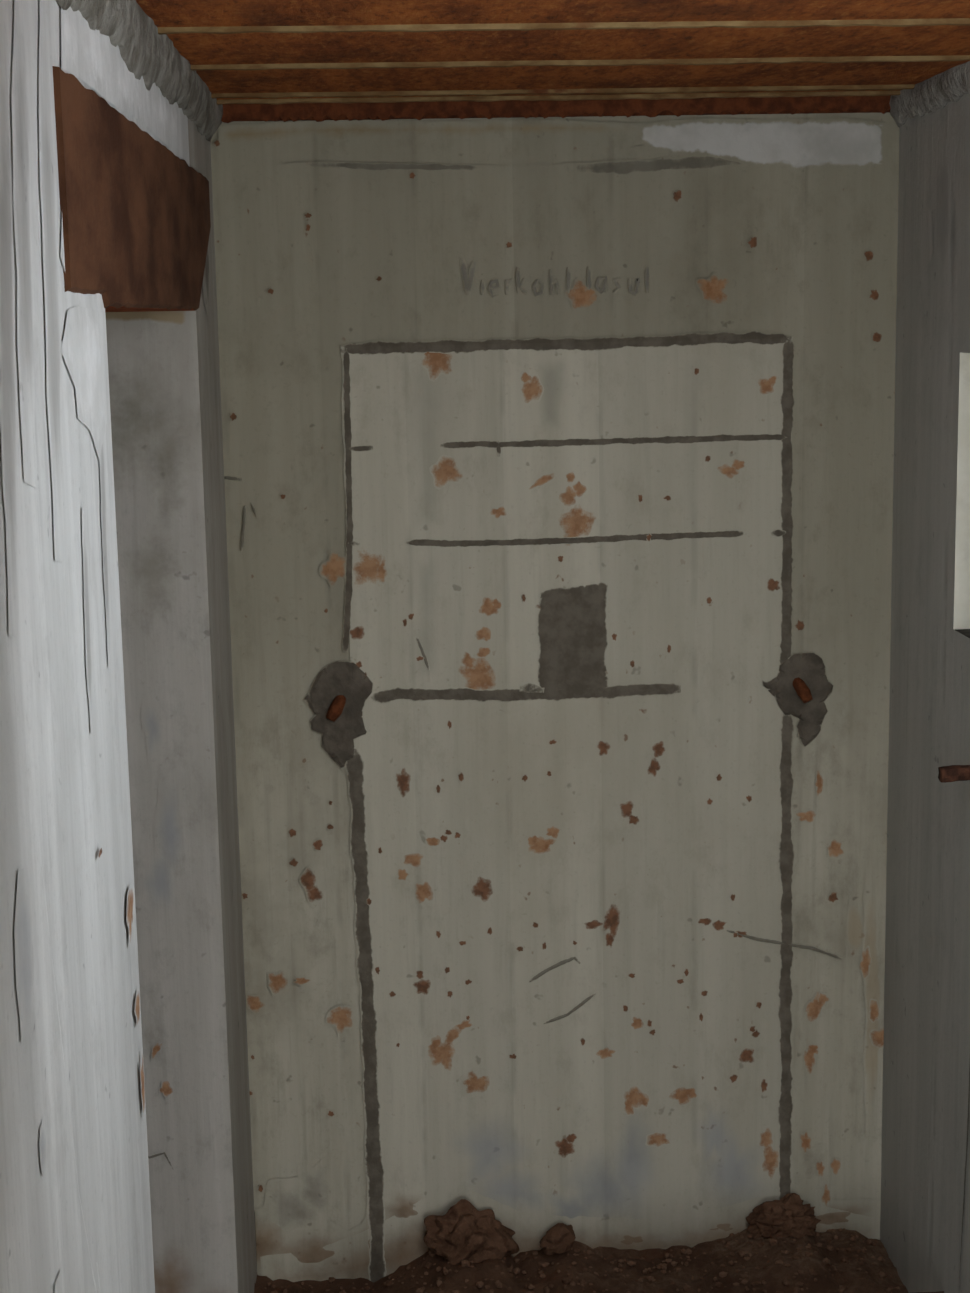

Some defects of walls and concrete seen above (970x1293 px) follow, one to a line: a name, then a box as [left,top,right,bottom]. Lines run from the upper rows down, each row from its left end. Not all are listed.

corrosion [527,471,598,563]
corrosion [319,544,389,590]
corrosion [457,596,502,690]
spalling [303,661,373,771]
spalling [762,652,833,748]
corrosion [288,857,324,903]
corrosion [397,829,461,905]
corrosion [470,875,494,904]
corrosion [572,901,621,949]
corrosion [426,1015,491,1095]
corrosion [554,1132,578,1159]
water stain [153,1229,237,1293]